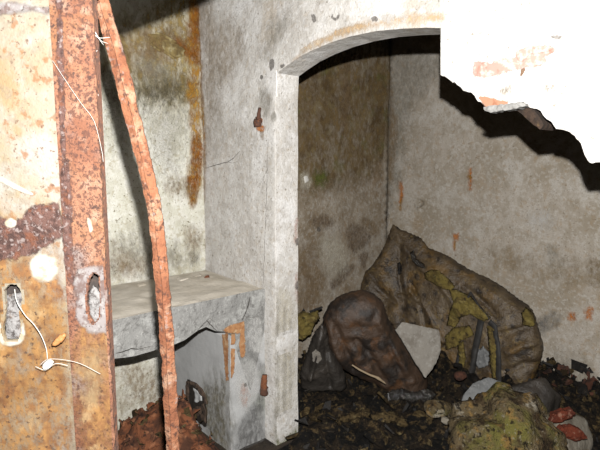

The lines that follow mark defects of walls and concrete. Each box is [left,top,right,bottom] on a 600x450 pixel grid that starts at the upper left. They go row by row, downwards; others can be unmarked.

rust [0,0,112,450]
rust [97,0,180,450]
rust [176,0,206,204]
spalling [479,96,555,131]